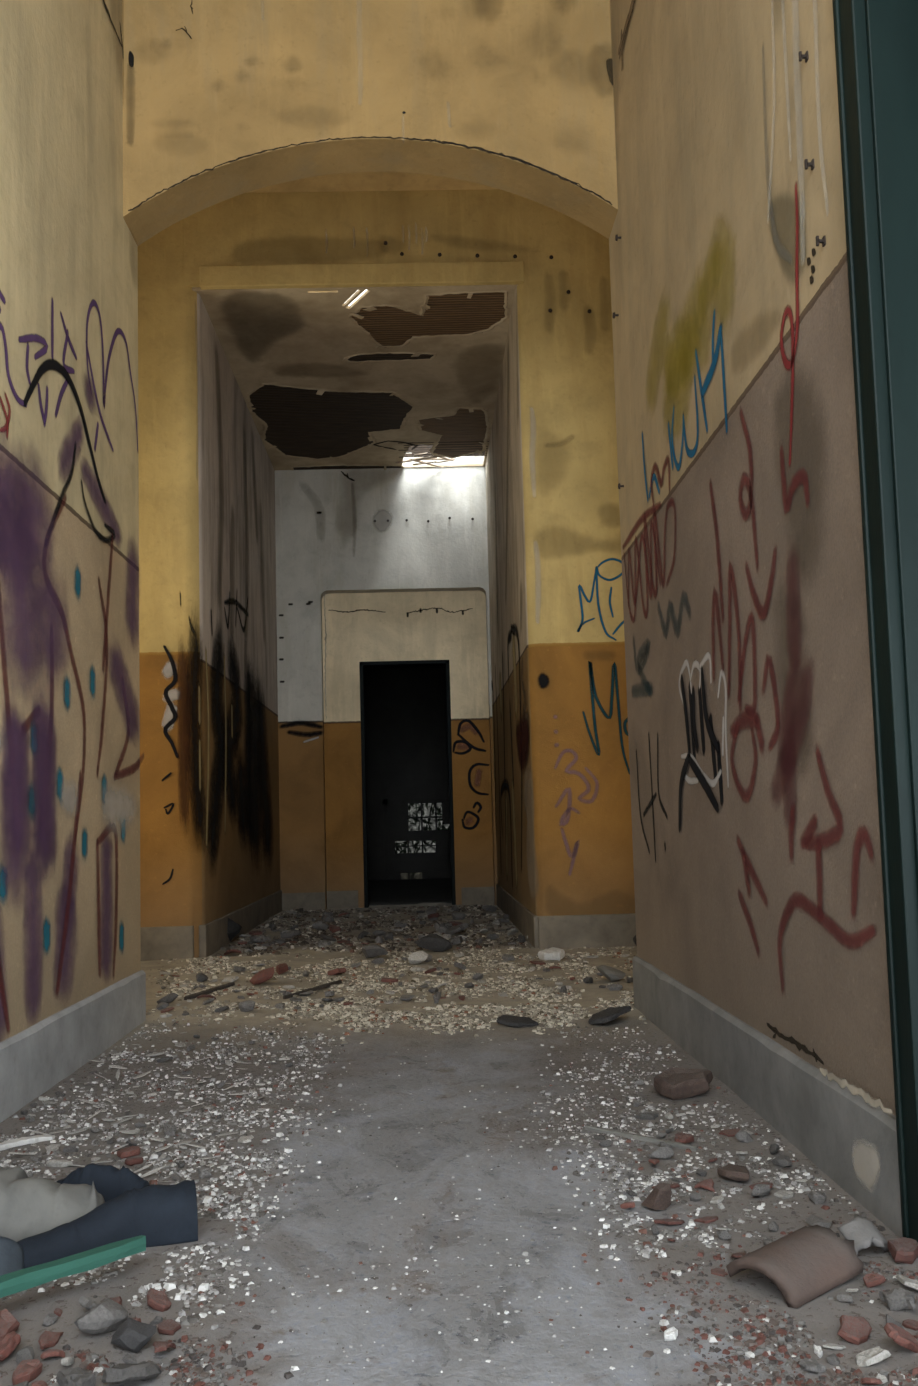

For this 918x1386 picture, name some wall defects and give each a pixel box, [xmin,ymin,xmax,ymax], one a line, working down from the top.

peeling [341,290,510,366]
peeling [244,382,492,470]